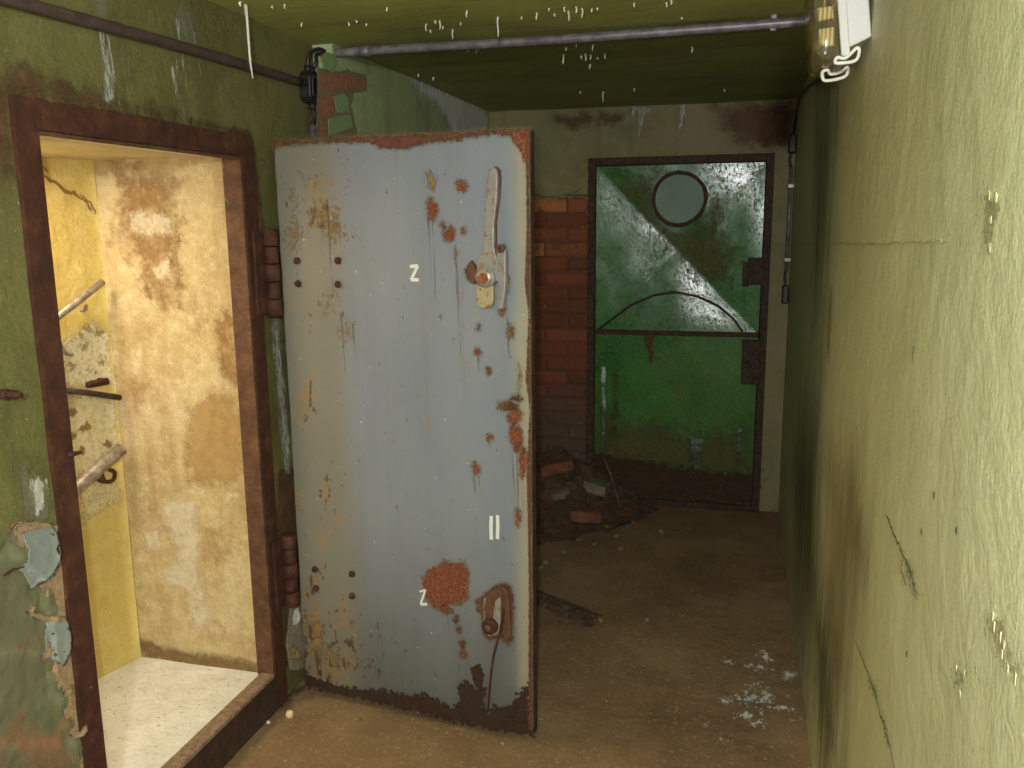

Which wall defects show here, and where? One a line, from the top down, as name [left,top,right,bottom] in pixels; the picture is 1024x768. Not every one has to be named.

leakage [99,31,120,104]
flaking render [315,52,367,141]
crack [43,166,96,214]
peeling [62,318,119,477]
rust [270,127,536,739]
peeling [78,481,124,526]
crack [886,515,921,600]
flaking render [0,519,88,768]
crack [855,640,895,768]